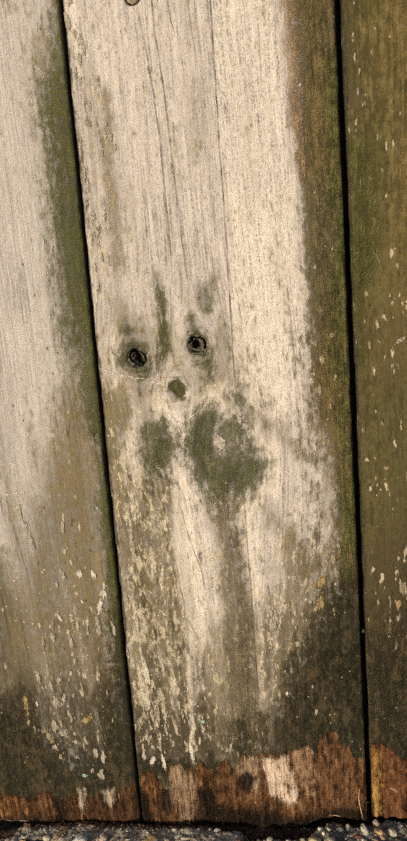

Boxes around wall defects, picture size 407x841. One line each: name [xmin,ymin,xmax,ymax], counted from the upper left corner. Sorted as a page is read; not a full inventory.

damp [0,0,219,818]
damp [141,0,407,762]